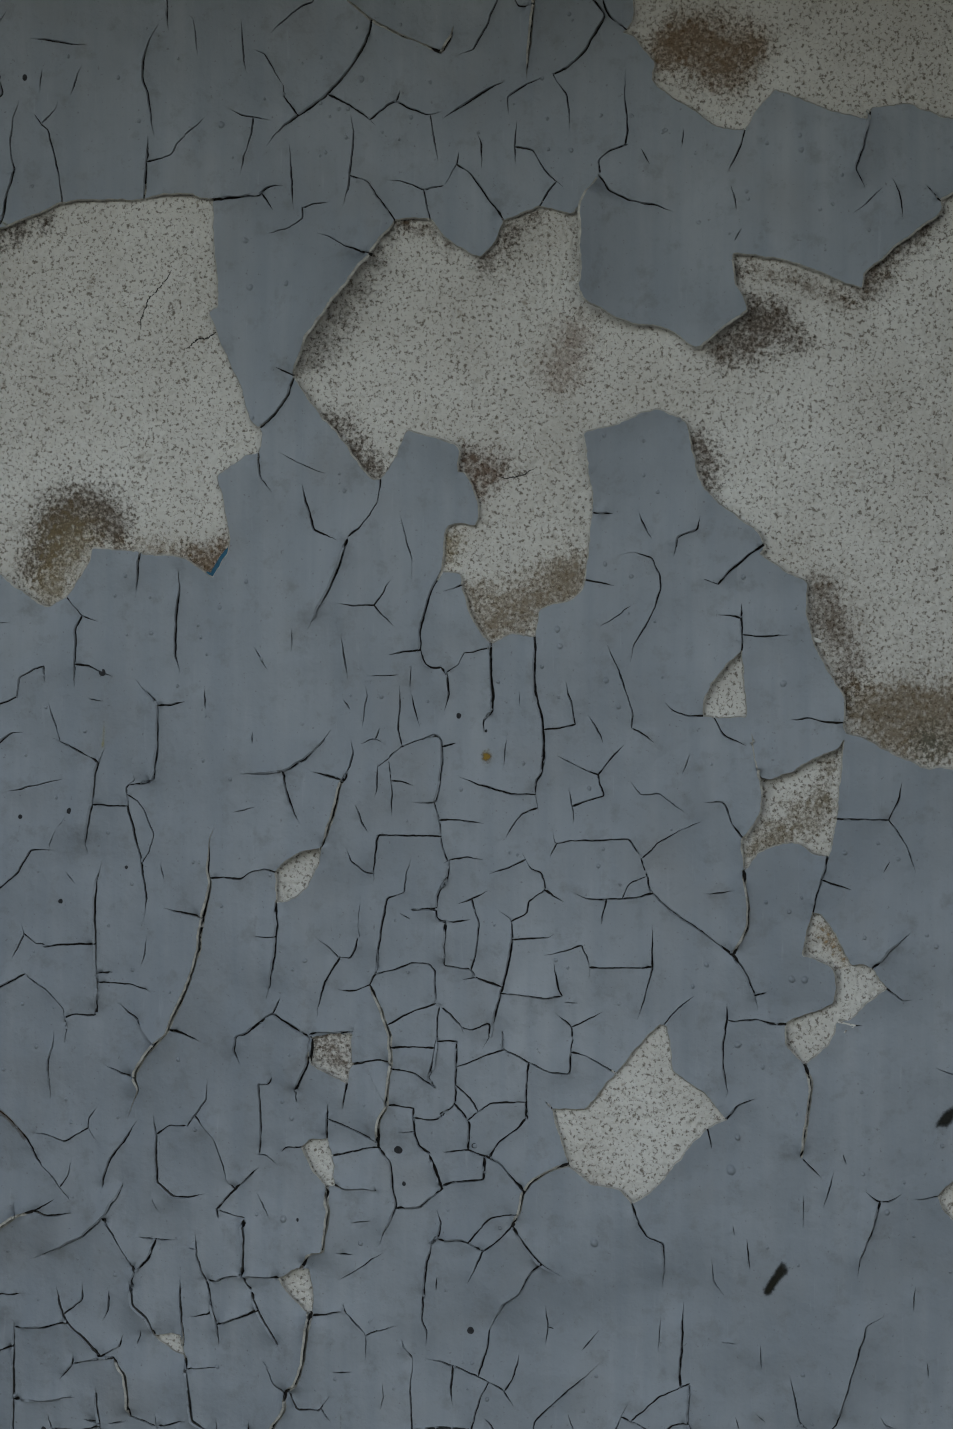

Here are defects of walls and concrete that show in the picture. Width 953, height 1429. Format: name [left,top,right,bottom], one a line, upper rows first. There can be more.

crack [0,115,63,224]
crack [143,54,195,196]
crack [213,0,627,256]
crack [599,83,668,210]
leakage [646,6,780,101]
leakage [16,476,138,605]
peeling [0,0,953,1134]
leakage [809,570,953,765]
crack [813,857,851,913]
peeling [243,1128,339,1319]
peeling [494,1025,725,1291]
crack [800,1063,846,1211]